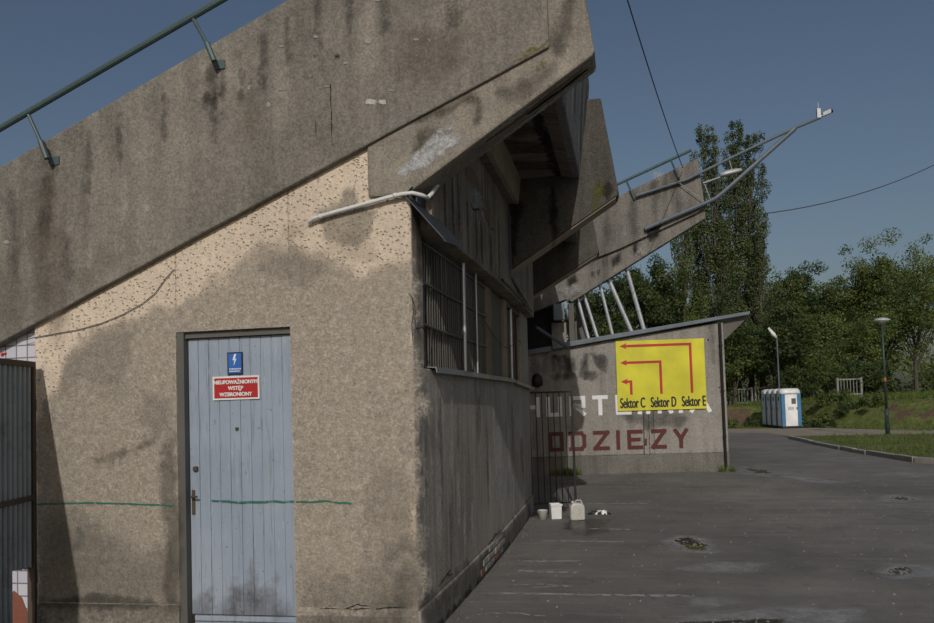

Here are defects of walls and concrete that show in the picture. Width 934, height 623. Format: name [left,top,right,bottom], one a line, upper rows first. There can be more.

spalling [398,59,595,186]
leakage [557,357,605,378]
leakage [36,245,437,623]
spalling [481,531,505,579]